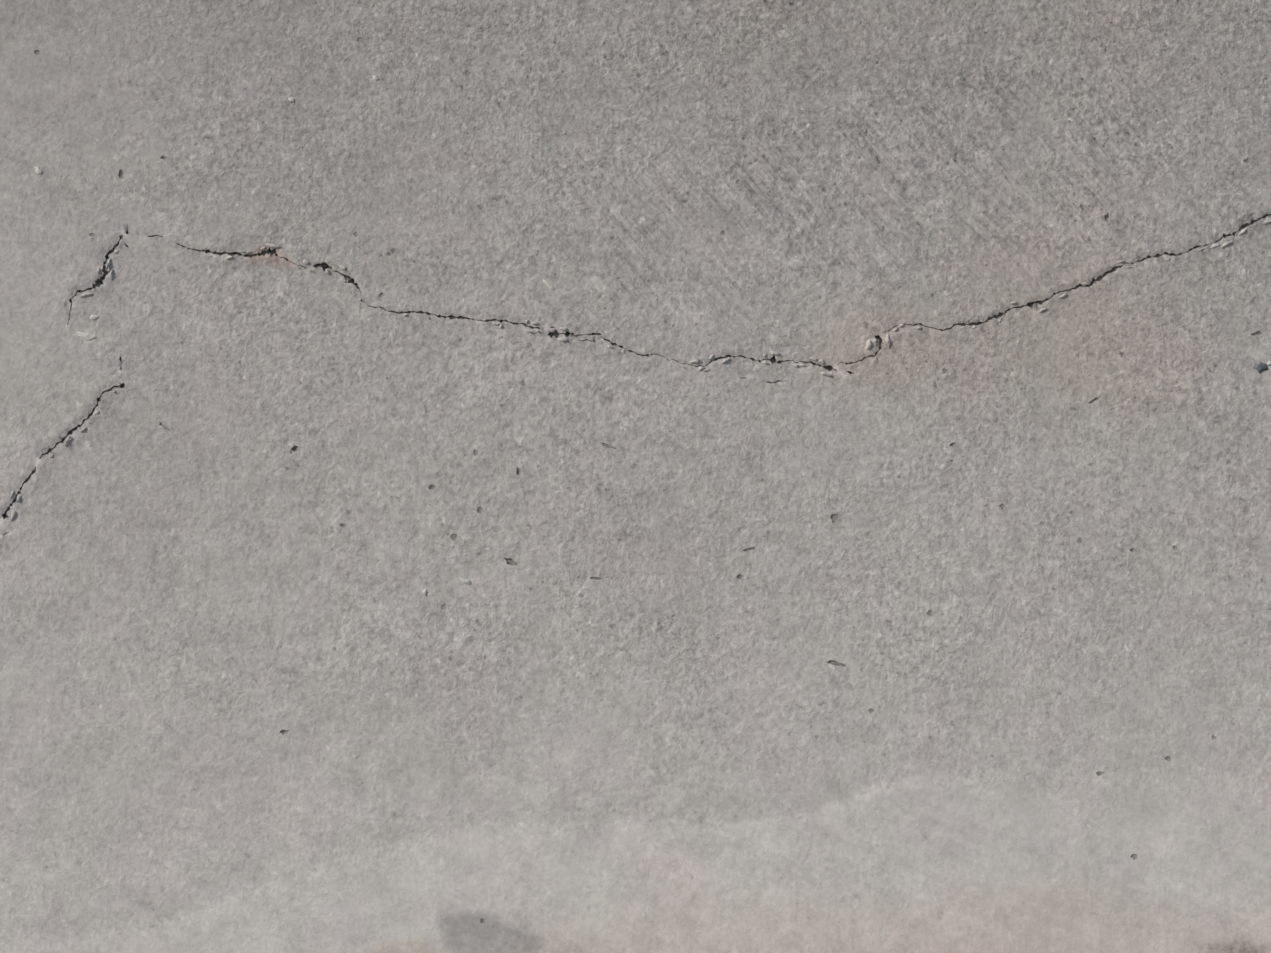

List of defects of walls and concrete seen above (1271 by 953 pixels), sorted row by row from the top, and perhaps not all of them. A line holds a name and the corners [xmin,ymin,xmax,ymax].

crack [67,213,1271,383]
crack [2,356,125,535]